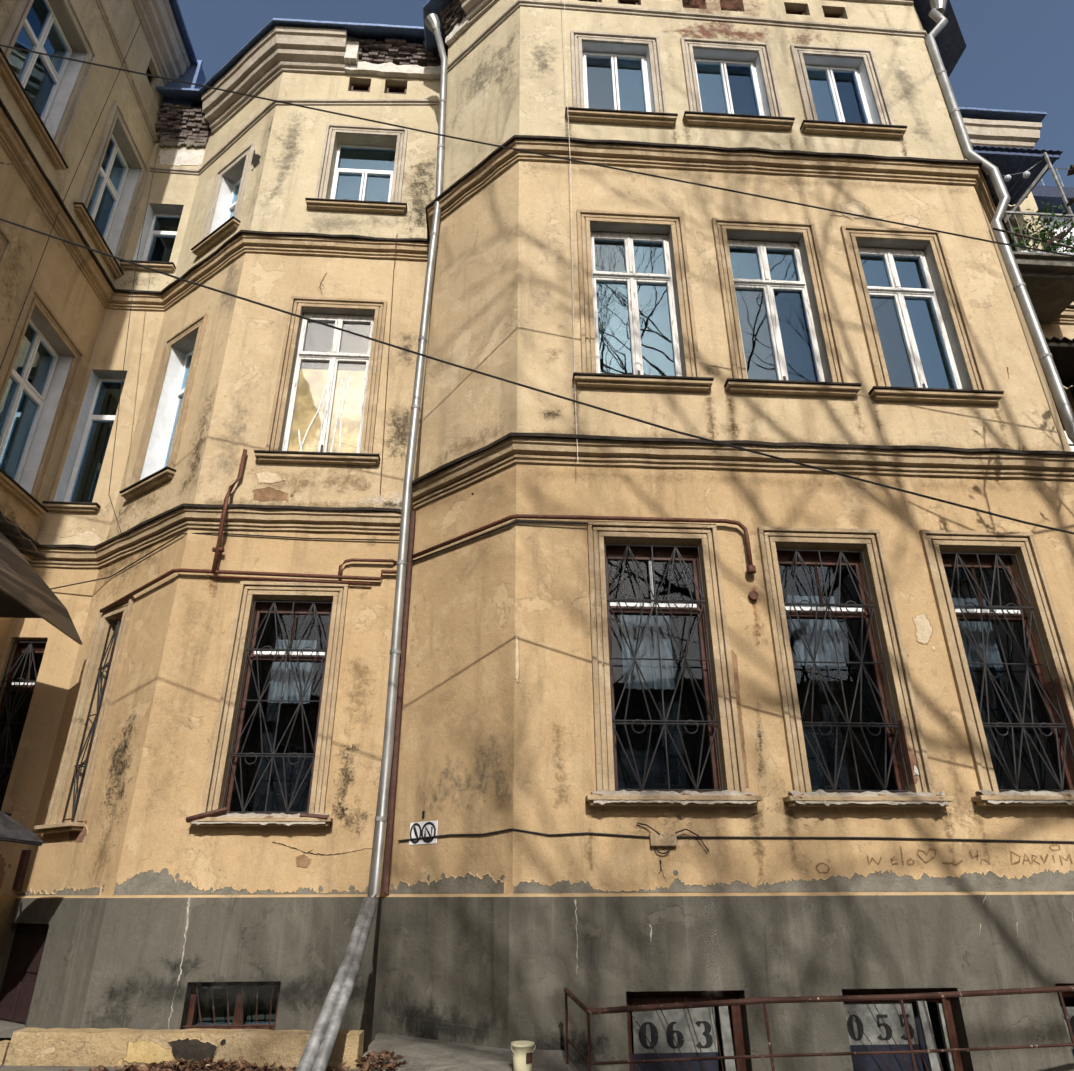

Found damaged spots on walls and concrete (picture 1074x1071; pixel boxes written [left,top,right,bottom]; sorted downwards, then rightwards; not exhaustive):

peeling [252,469,293,503]
peeling [912,612,935,650]
water stain [104,715,135,805]
water stain [337,745,367,827]
peeling [389,868,1074,894]
crack [168,898,190,1029]
spalling [118,1036,226,1065]